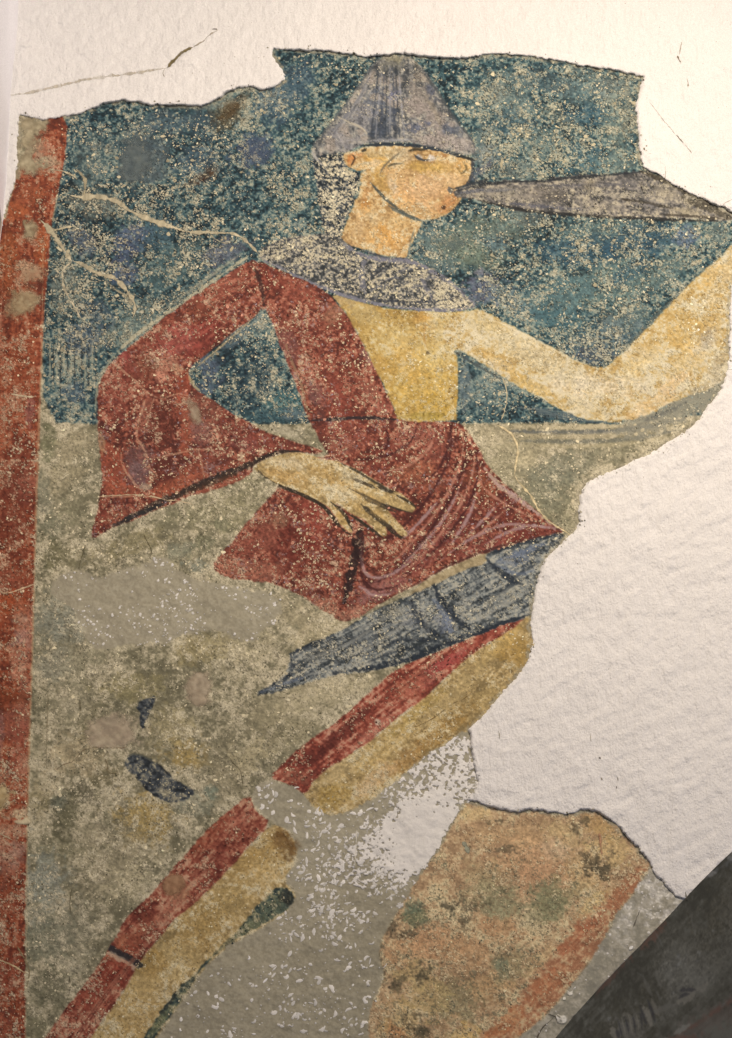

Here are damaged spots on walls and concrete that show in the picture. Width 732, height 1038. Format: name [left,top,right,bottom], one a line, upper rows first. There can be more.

crack [25,28,217,94]
crack [50,169,258,253]
crack [40,220,137,320]
peeling [328,736,476,897]